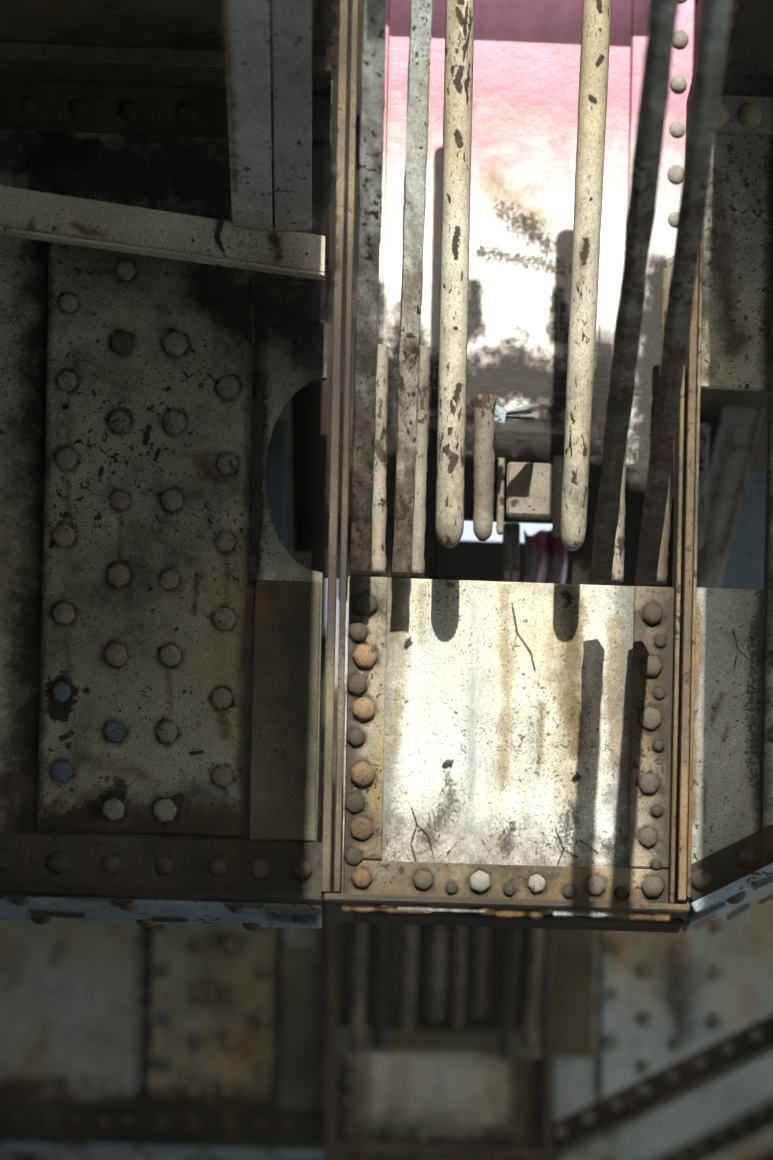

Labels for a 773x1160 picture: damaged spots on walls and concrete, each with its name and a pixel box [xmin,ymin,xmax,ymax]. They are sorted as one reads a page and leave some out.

crack [511,603,536,670]
corrosion [562,586,586,755]
crack [410,807,455,859]
crack [555,828,598,864]
peeling [0,889,324,919]
peeling [689,875,773,927]